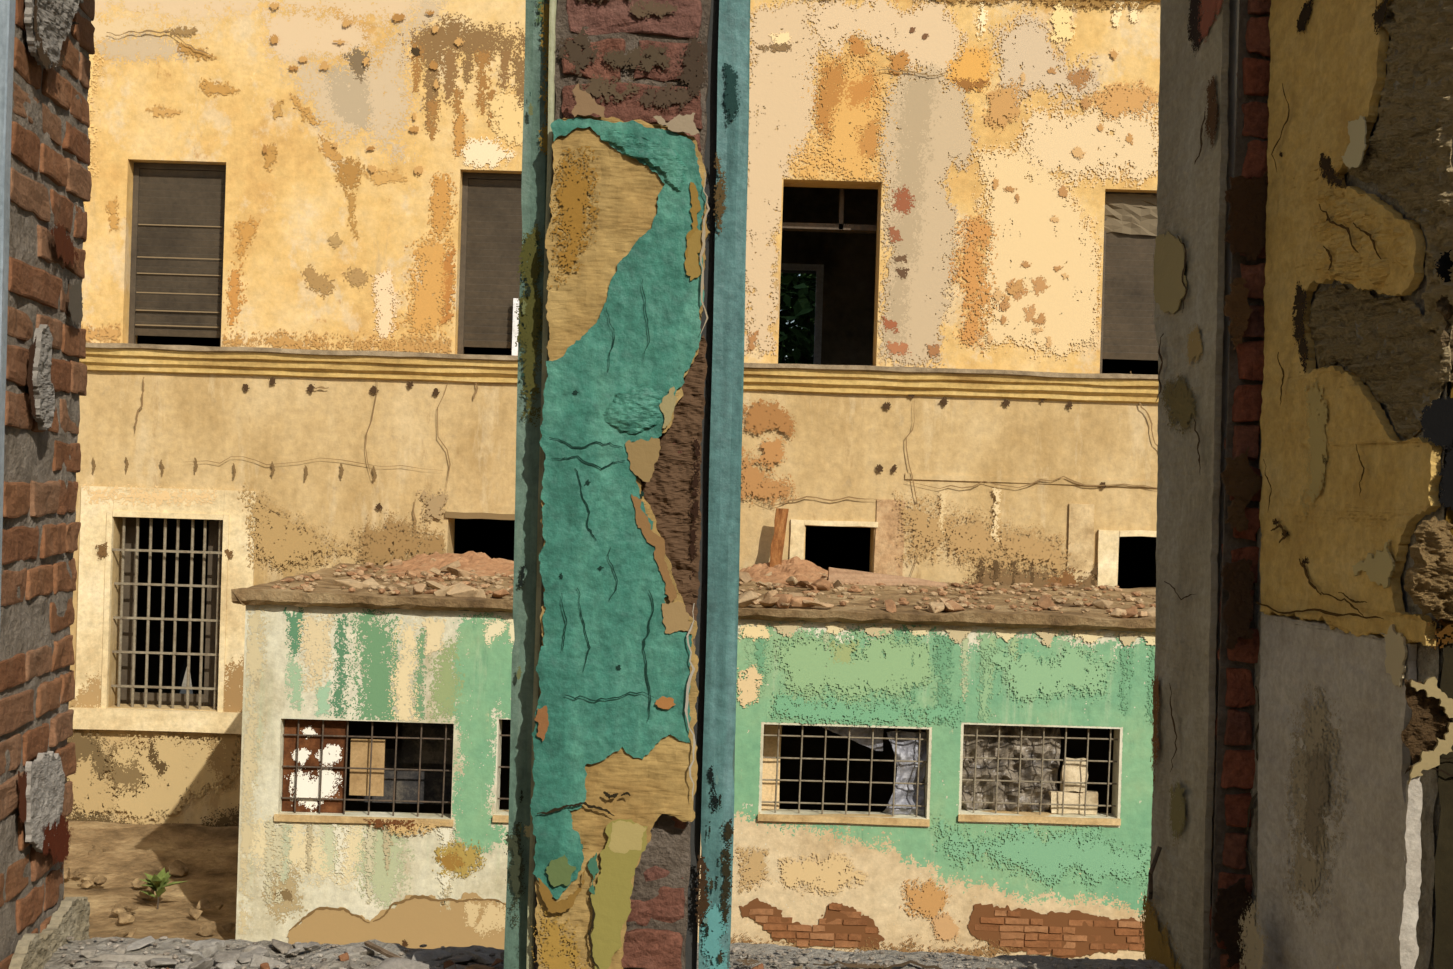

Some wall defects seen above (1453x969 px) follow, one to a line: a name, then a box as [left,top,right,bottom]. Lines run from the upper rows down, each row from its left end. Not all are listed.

crack [72,21,212,56]
damp [222,0,525,354]
peeling [723,0,1159,368]
spalling [1292,0,1453,440]
peeling [43,605,272,935]
peeling [286,680,343,813]
damp [283,607,465,723]
spalling [287,819,648,969]
damp [482,616,515,648]
crack [549,437,702,798]
spalling [625,335,708,634]
spalling [1381,624,1453,785]